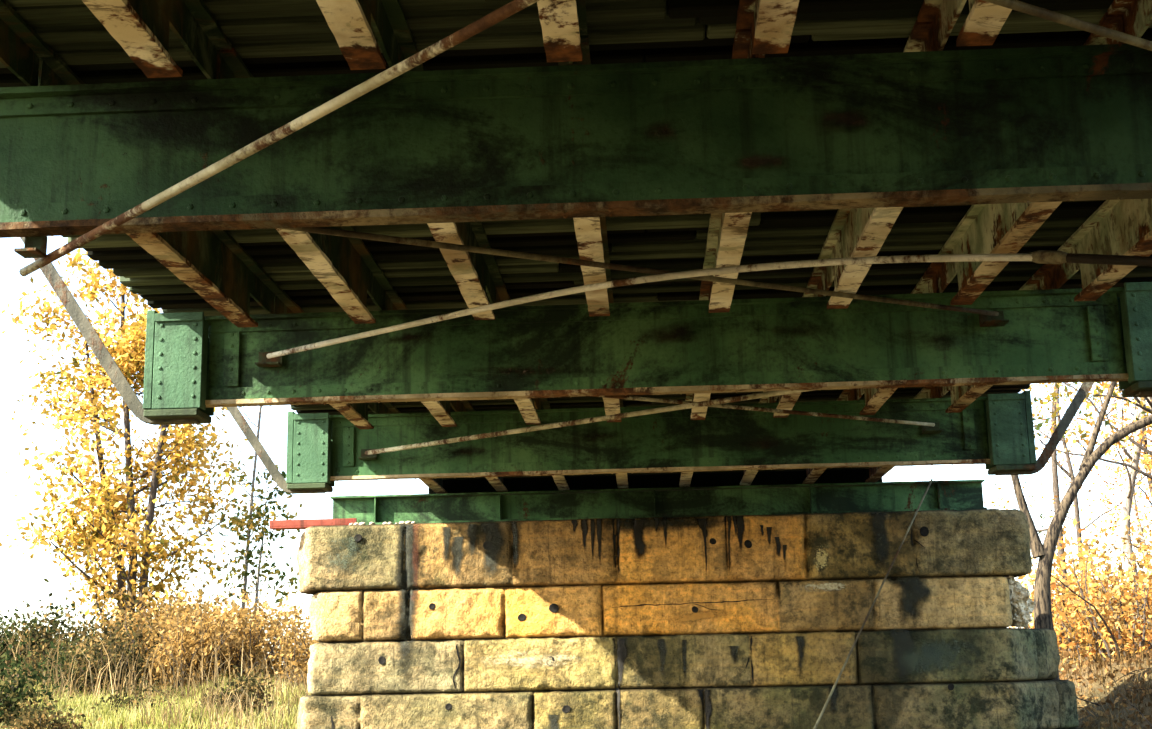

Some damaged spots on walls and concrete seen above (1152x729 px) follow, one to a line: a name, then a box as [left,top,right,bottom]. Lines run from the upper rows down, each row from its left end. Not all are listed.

leakage [443,521,519,574]
leakage [571,514,745,573]
leakage [760,525,787,561]
leakage [870,512,889,564]
leakage [396,524,419,666]
leakage [888,575,931,677]